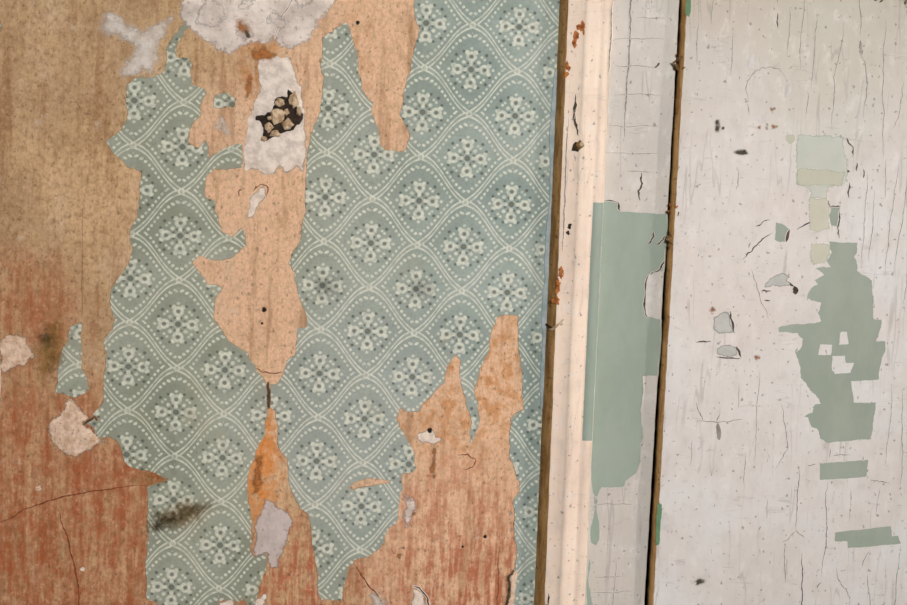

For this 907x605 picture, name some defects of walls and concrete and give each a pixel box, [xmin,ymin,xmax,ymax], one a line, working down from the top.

corrosion [572,20,585,49]
crack [605,0,665,211]
crack [695,0,907,319]
crack [0,484,146,605]
peeling [0,0,419,605]
peeling [218,315,523,605]
peeling [582,201,668,546]
crack [642,231,666,318]
crack [689,311,907,605]
peeling [778,242,886,443]
peeling [820,460,868,480]
peeling [835,526,901,548]